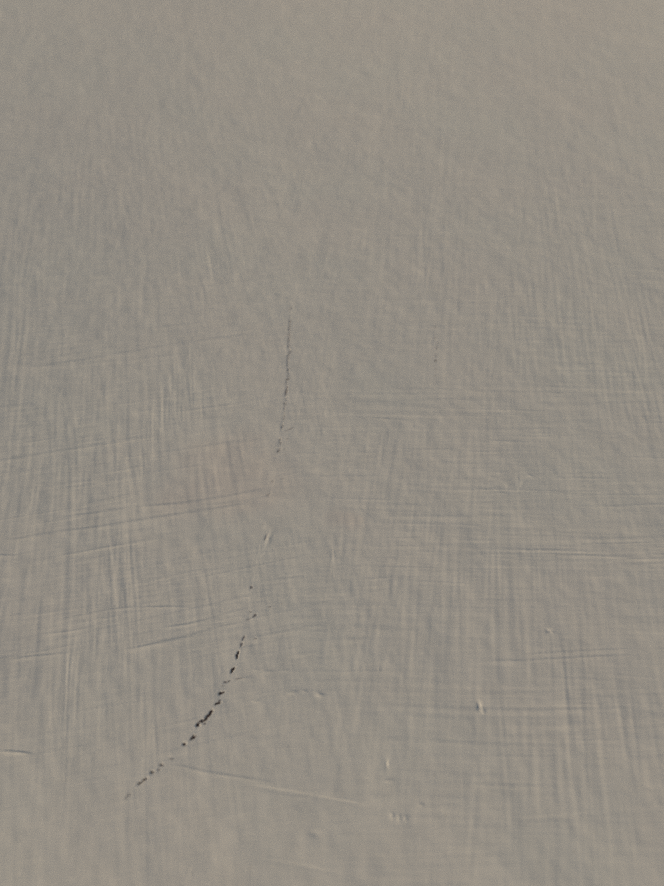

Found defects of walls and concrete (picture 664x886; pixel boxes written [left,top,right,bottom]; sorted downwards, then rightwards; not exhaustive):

crack [277,306,293,453]
crack [125,535,271,800]